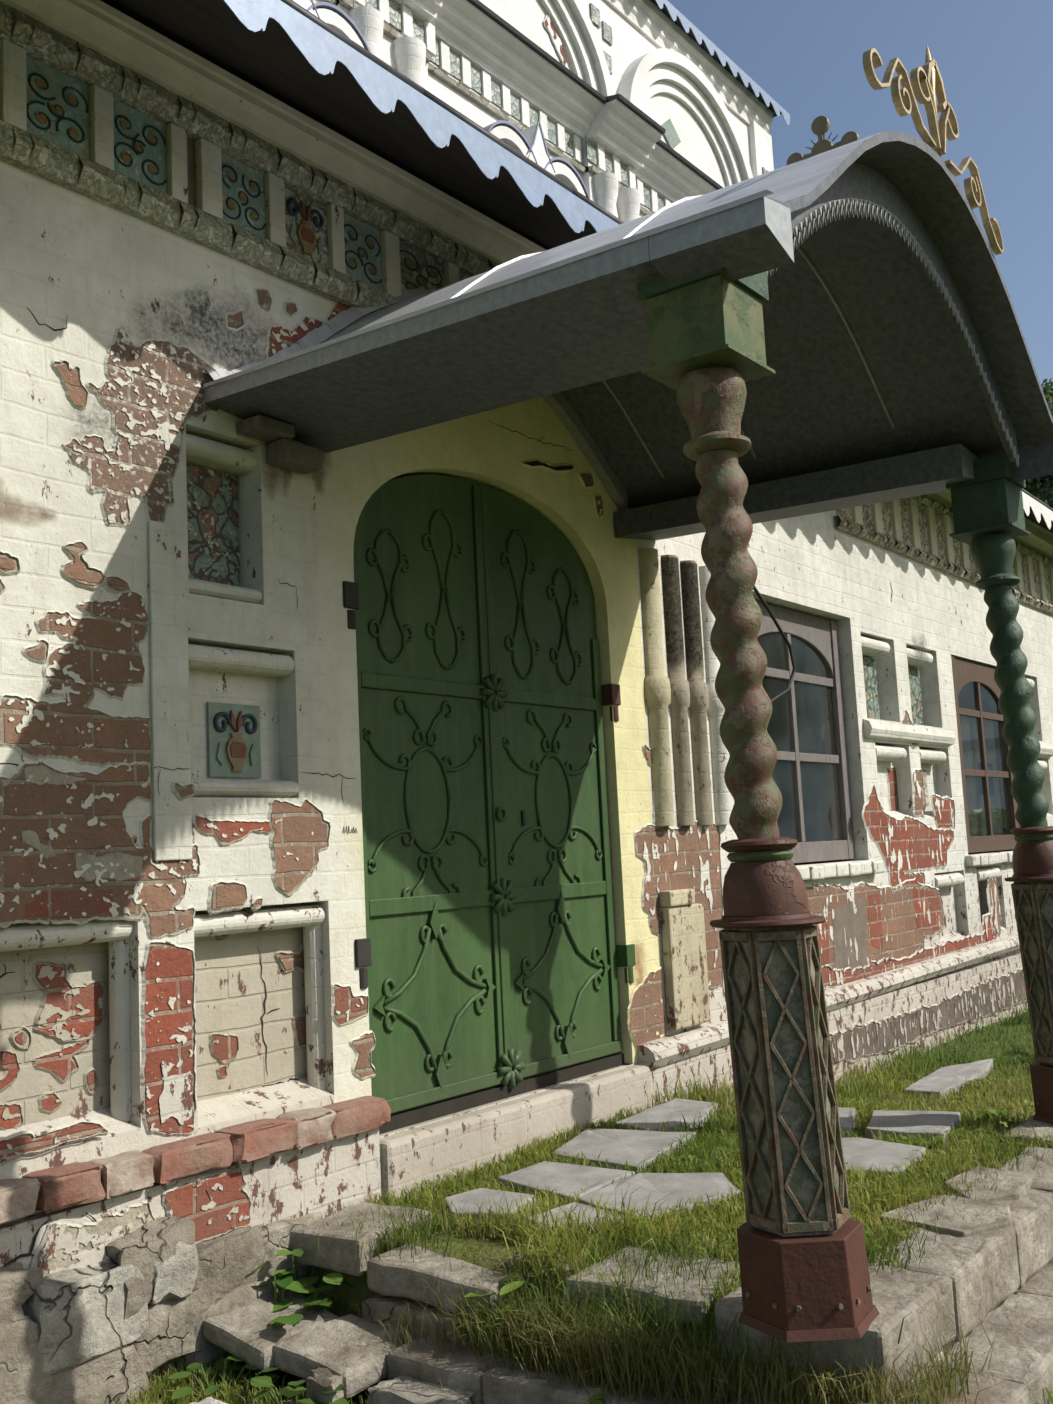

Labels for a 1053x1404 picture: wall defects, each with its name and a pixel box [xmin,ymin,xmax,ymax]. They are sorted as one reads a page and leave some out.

peeling [50,325,234,529]
peeling [901,709,919,749]
flaking render [0,540,331,1163]
flaking render [634,789,723,990]
flaking render [805,765,1002,990]
crack [4,1221,48,1267]
flaking render [30,1165,252,1304]